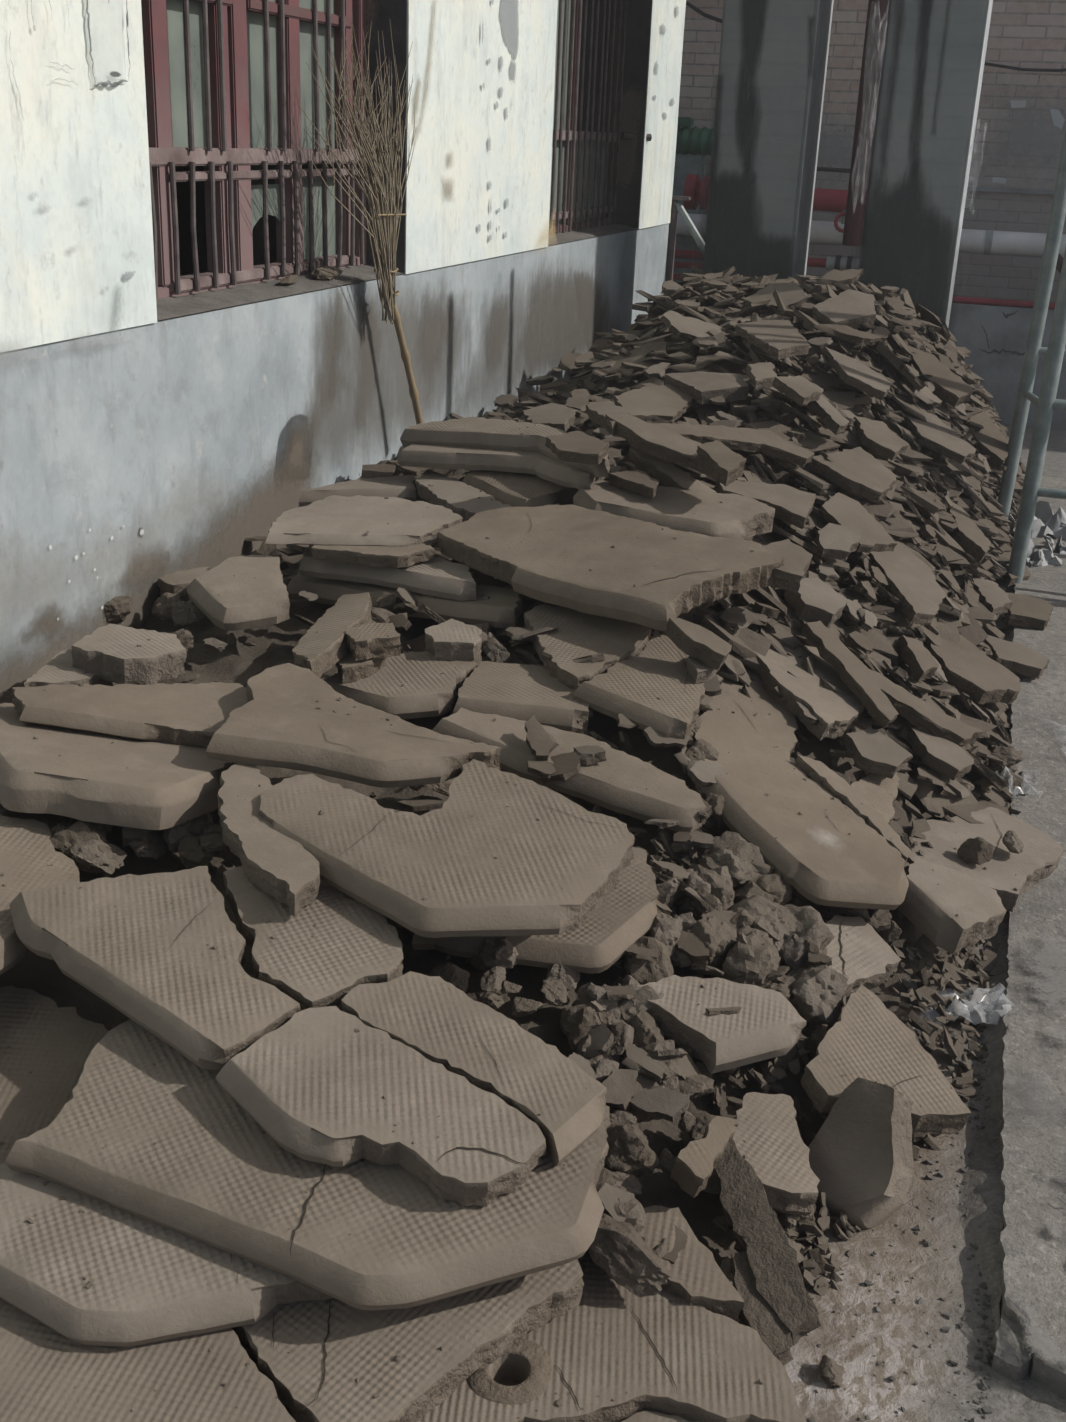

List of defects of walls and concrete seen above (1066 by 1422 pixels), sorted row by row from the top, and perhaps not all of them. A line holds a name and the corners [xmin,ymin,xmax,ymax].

peeling [482,0,519,118]
water stain [698,0,793,281]
water stain [858,0,954,331]
water stain [307,299,457,454]
water stain [467,278,611,402]